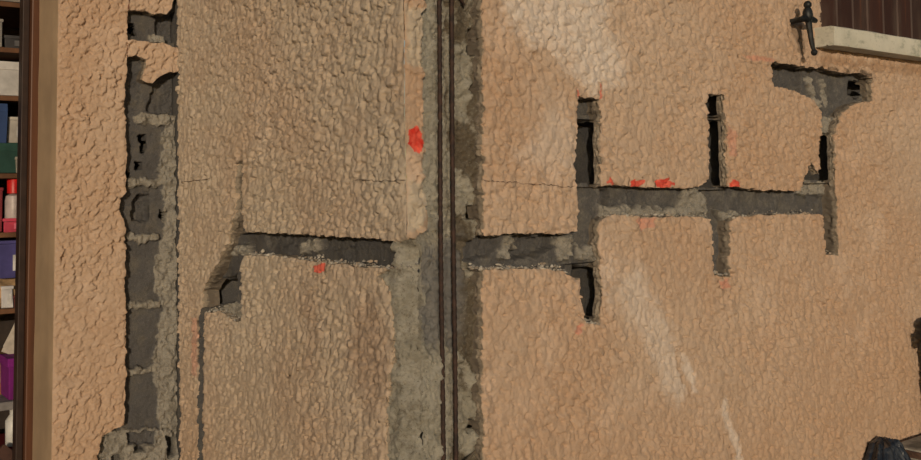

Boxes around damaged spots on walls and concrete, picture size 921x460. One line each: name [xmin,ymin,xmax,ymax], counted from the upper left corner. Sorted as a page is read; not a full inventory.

spalling [127,0,176,48]
spalling [127,55,176,84]
spalling [377,0,486,460]
spalling [165,435,177,458]